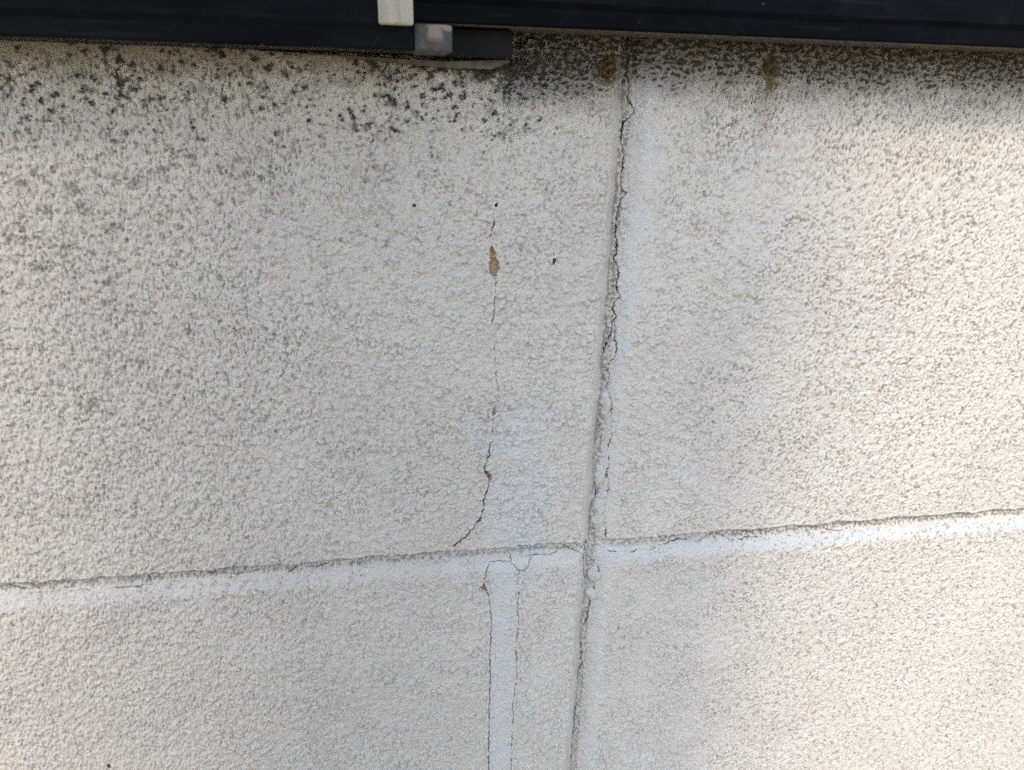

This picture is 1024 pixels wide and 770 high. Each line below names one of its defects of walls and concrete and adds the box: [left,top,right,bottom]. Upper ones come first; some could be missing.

water stain [0,32,1024,153]
crack [602,41,635,379]
crack [452,347,499,547]
crack [479,408,764,770]